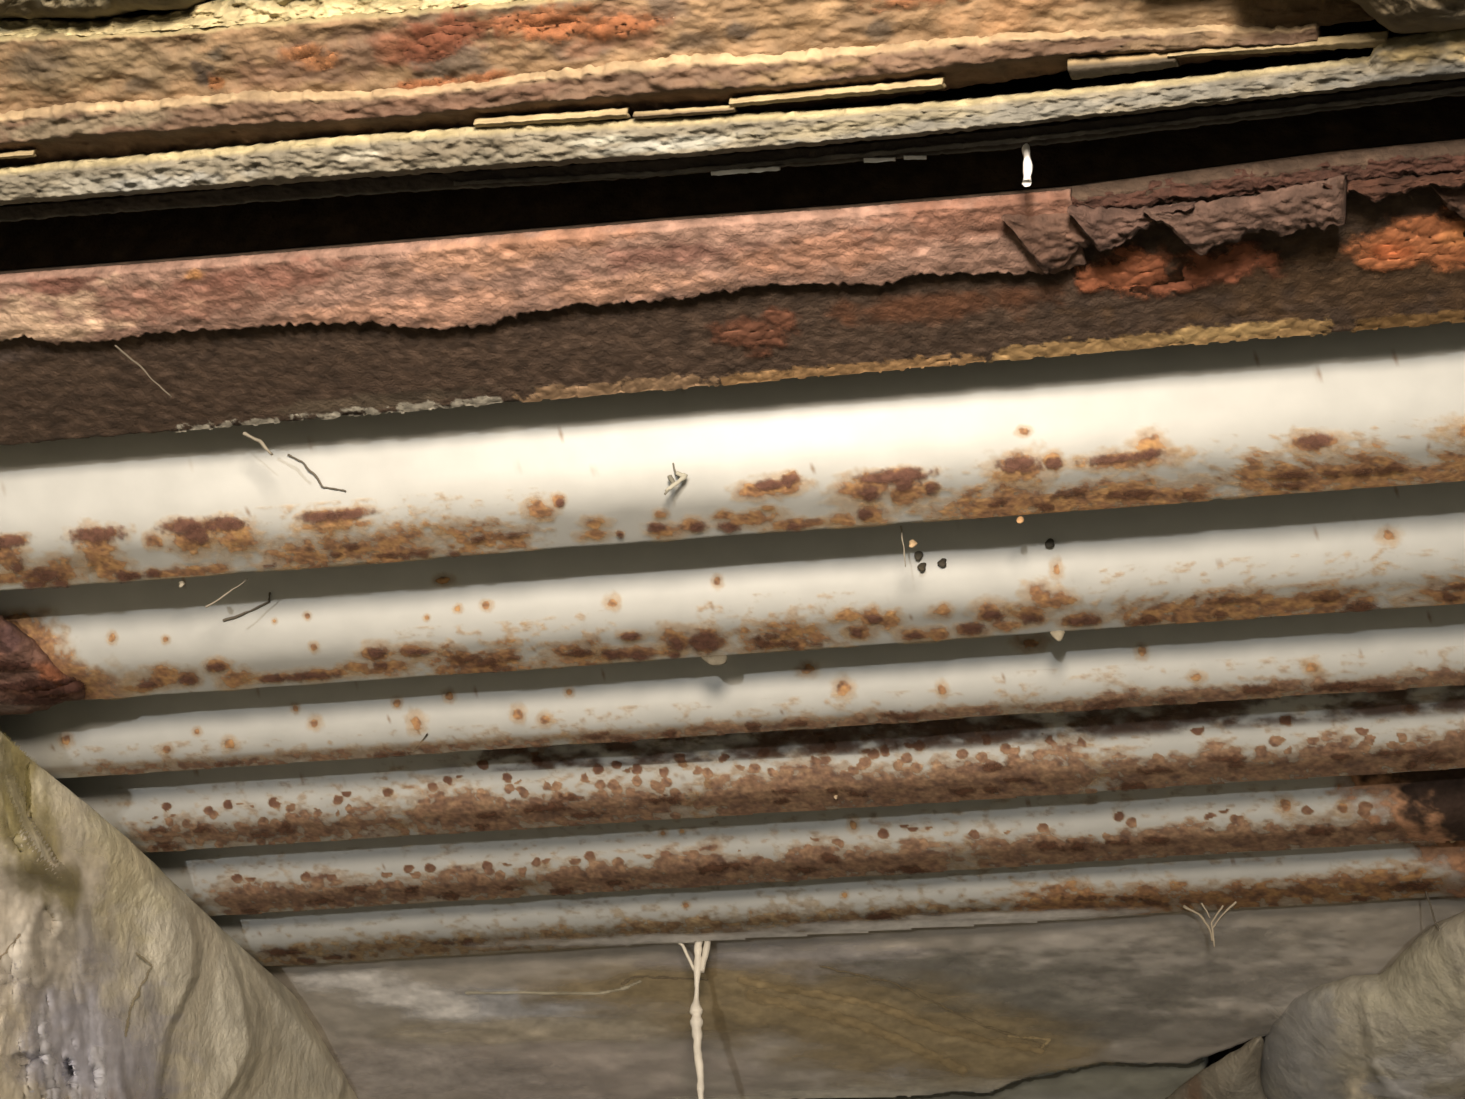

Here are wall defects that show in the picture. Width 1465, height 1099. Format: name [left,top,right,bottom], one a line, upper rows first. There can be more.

rust [398,71,505,90]
rust [396,8,657,61]
rust [0,153,1465,346]
rust [176,306,1334,433]
rust [0,494,565,589]
rust [578,517,624,540]
rust [0,564,1378,716]
rust [648,425,1465,539]
rust [1402,576,1465,606]
rust [87,662,1465,966]
crack [621,976,708,985]
crack [820,966,1205,1099]